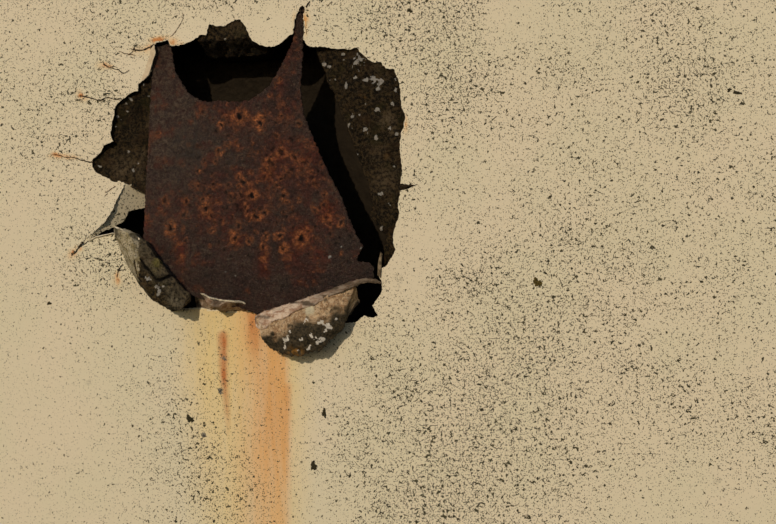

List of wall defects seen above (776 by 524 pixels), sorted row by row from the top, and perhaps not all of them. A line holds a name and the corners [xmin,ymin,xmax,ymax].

crack [103,13,183,73]
corrosion [127,33,187,57]
corrosion [290,7,312,42]
spalling [78,7,413,357]
corrosion [168,309,319,524]